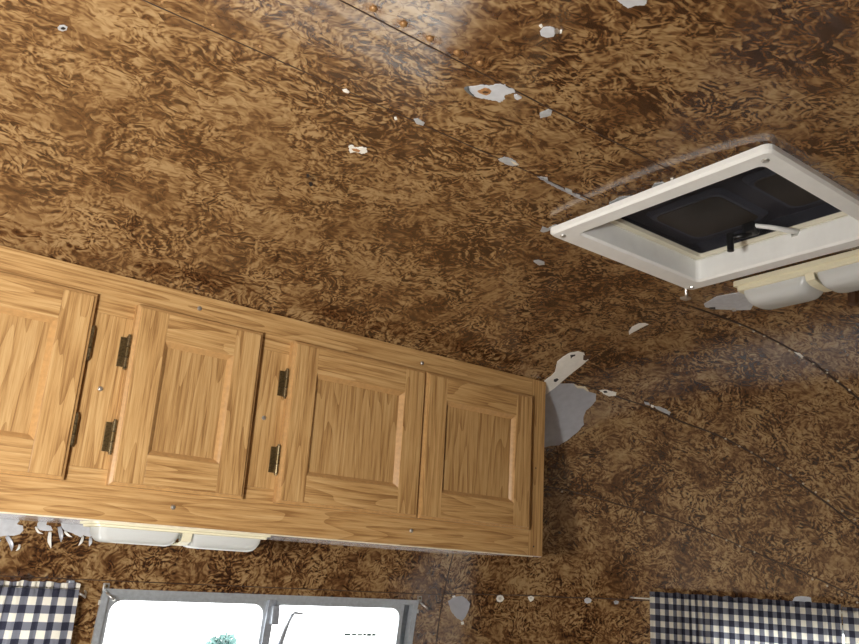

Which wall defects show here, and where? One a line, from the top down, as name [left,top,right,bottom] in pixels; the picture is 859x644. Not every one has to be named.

peeling [617,0,647,8]
peeling [539,24,562,38]
peeling [464,84,522,102]
peeling [704,292,753,312]
peeling [544,351,617,447]
peeling [0,519,23,551]
peeling [35,522,92,548]
peeling [448,595,470,625]